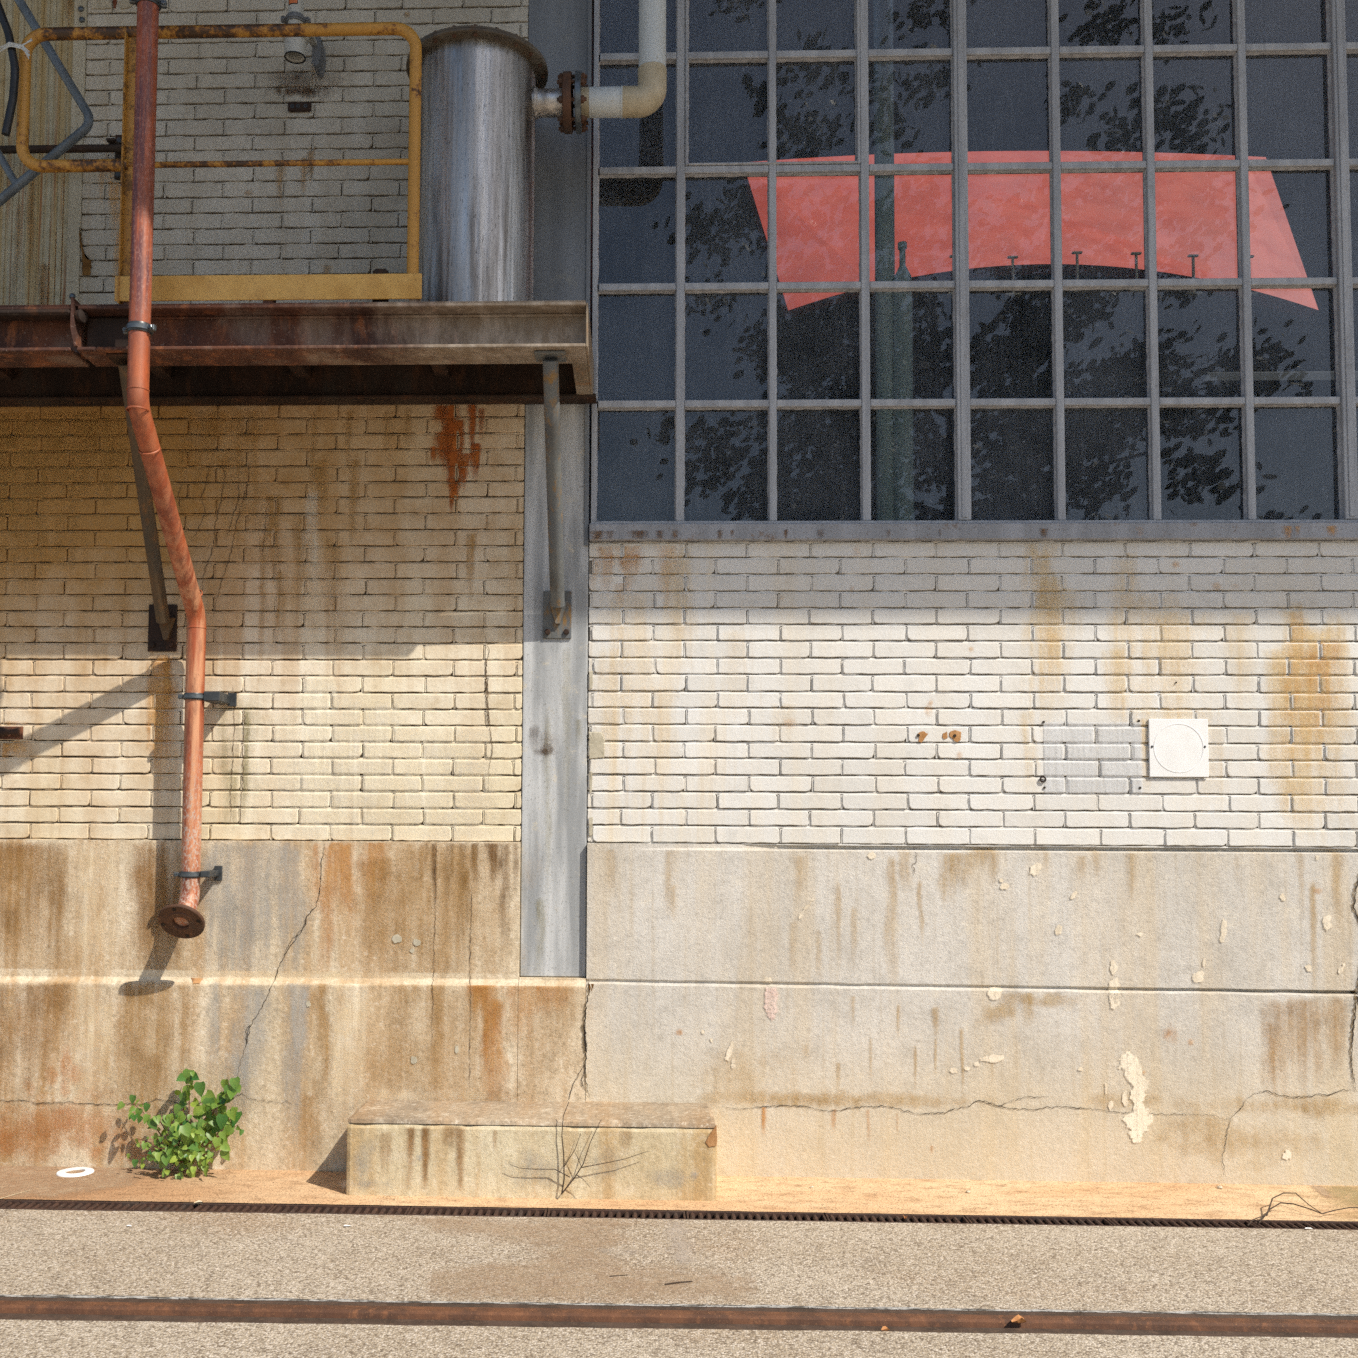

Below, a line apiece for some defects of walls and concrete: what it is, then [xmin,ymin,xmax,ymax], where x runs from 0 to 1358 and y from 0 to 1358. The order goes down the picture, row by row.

corrosion [431,405,484,506]
corrosion [314,843,351,889]
corrosion [452,843,498,894]
crack [1350,849,1358,921]
crack [243,845,325,1054]
corrosion [471,985,501,1073]
crack [569,980,592,1098]
crack [722,983,1358,1171]
spalling [1105,1051,1153,1143]
corrosion [0,1111,145,1197]
corrosion [409,1128,428,1177]